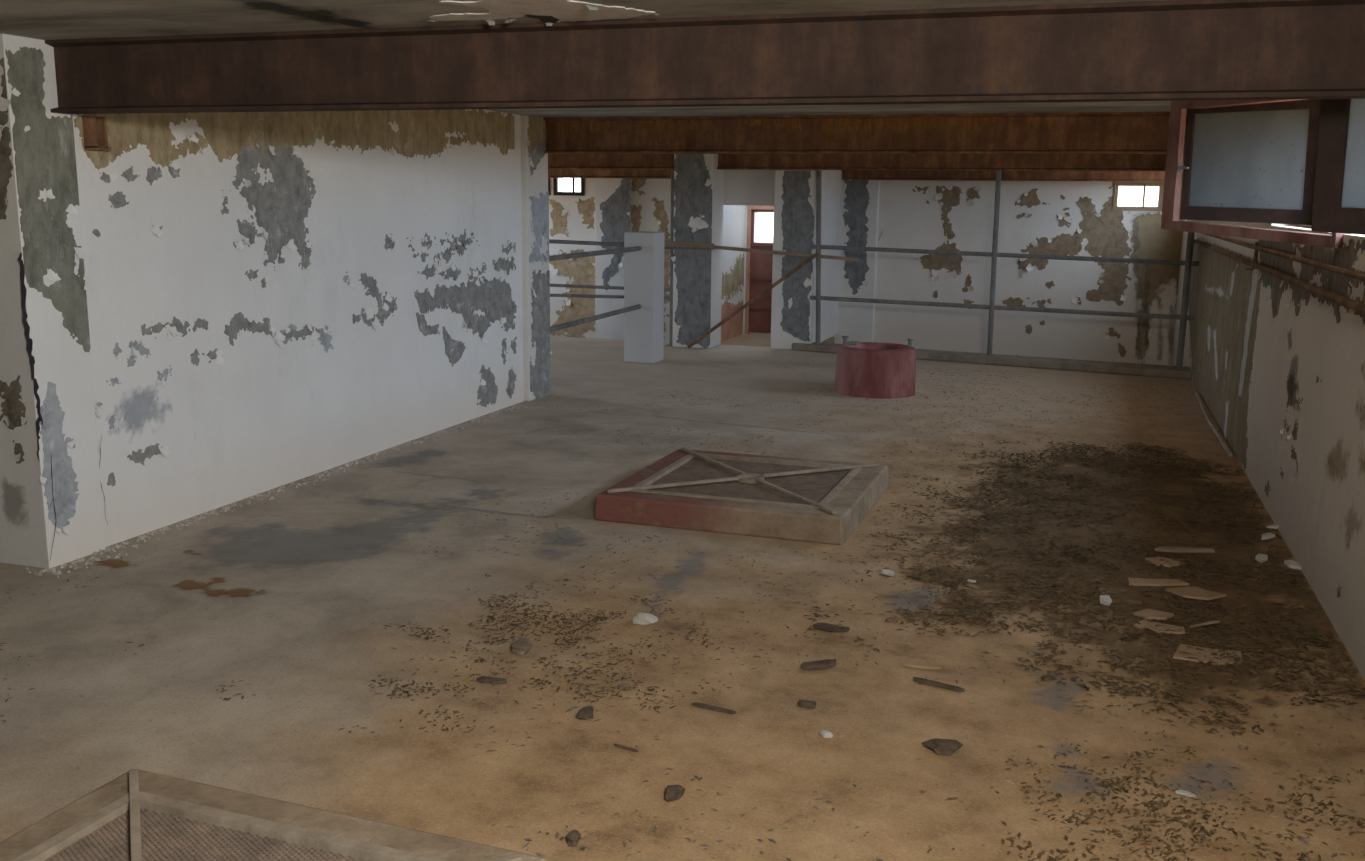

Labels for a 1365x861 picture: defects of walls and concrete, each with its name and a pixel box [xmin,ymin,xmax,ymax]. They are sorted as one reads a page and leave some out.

peeling [106,316,208,386]
peeling [190,312,334,366]
peeling [0,47,546,352]
peeling [384,154,744,407]
peeling [776,171,814,344]
peeling [843,180,870,295]
peeling [912,185,981,309]
peeling [1000,183,1132,334]
peeling [1188,238,1365,472]
peeling [0,375,79,535]
peeling [127,443,170,465]
corrosion [174,578,264,597]